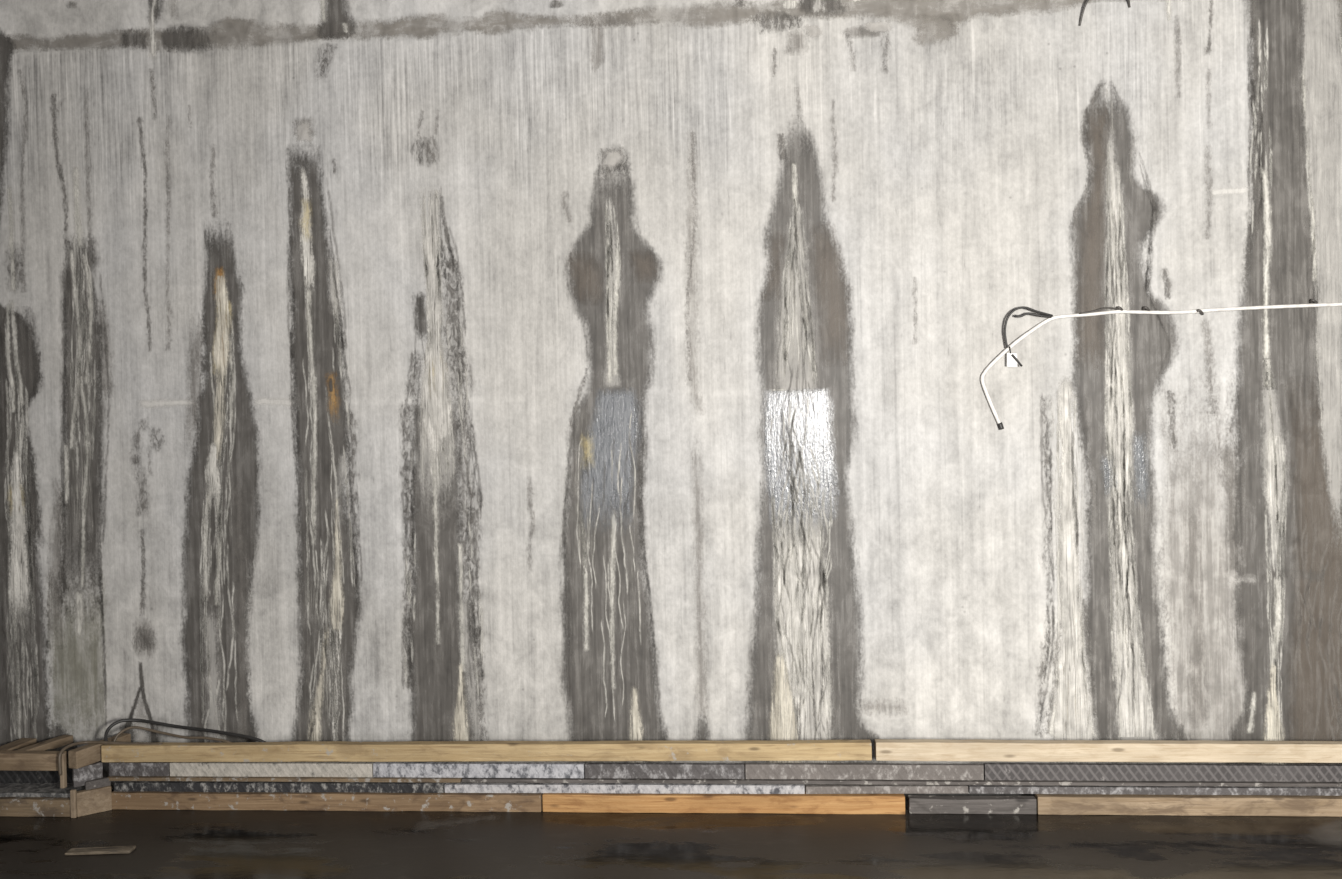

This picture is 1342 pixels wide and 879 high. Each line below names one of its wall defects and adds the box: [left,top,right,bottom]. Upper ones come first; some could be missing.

water stain [465,10,654,34]
water stain [680,0,1091,43]
water stain [0,0,449,749]
water stain [401,191,483,741]
water stain [562,149,668,741]
water stain [746,133,878,755]
water stain [1039,85,1185,741]
water stain [1224,0,1342,741]